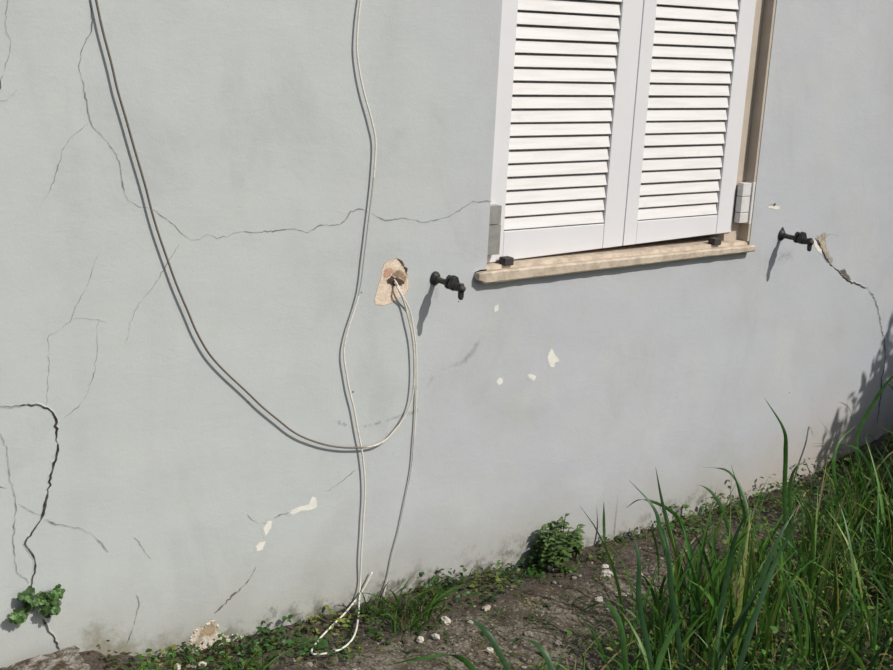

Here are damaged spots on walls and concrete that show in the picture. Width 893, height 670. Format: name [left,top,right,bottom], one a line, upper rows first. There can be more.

spalling [374,258,409,305]
crack [815,239,886,423]
peeling [546,345,561,370]
crack [0,402,80,586]
peeling [286,494,319,517]
peeling [254,518,275,554]
crack [43,618,60,650]
spalling [188,619,245,653]